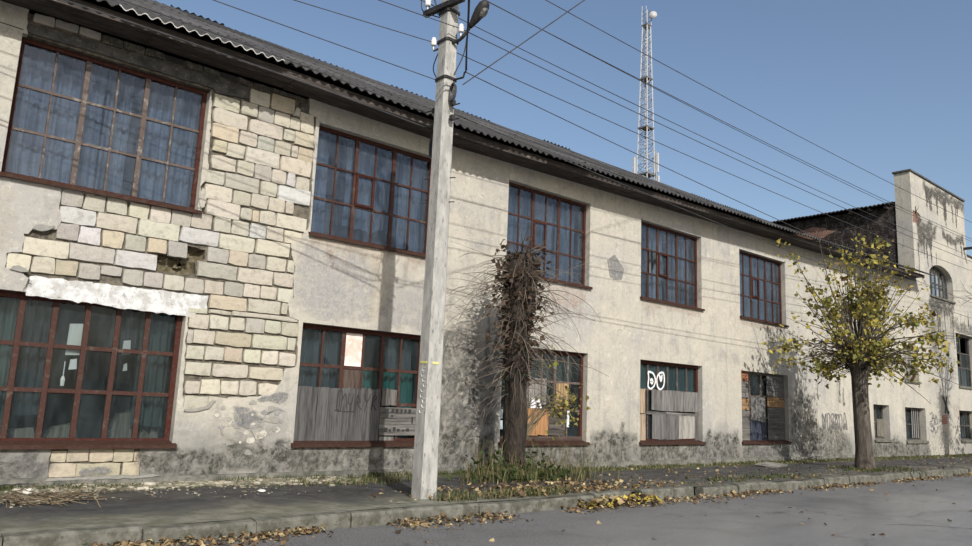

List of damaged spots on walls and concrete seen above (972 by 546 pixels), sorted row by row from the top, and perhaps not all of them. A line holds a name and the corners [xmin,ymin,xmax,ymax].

flaking render [5,13,315,456]
damp [917,183,964,269]
damp [0,450,47,479]
damp [526,388,851,464]